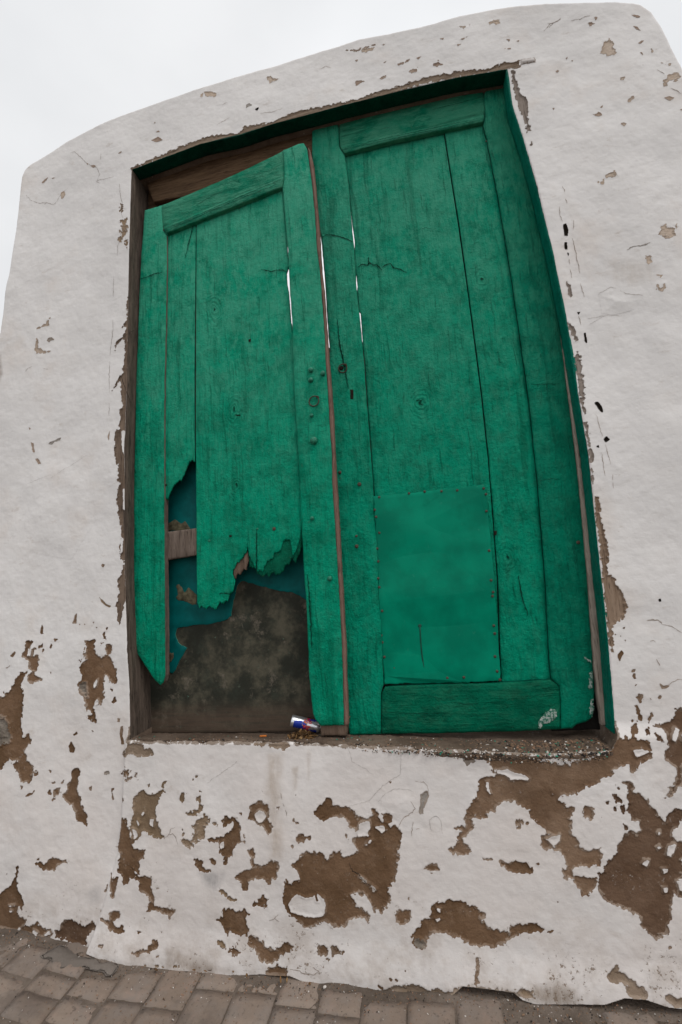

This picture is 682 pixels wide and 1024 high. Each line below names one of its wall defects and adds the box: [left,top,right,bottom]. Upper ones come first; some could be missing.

peeling [130,57,533,170]
peeling [567,322,629,661]
peeling [0,626,92,827]
peeling [0,781,175,949]
peeling [131,932,180,968]
peeling [179,775,554,999]
peeling [448,669,682,950]